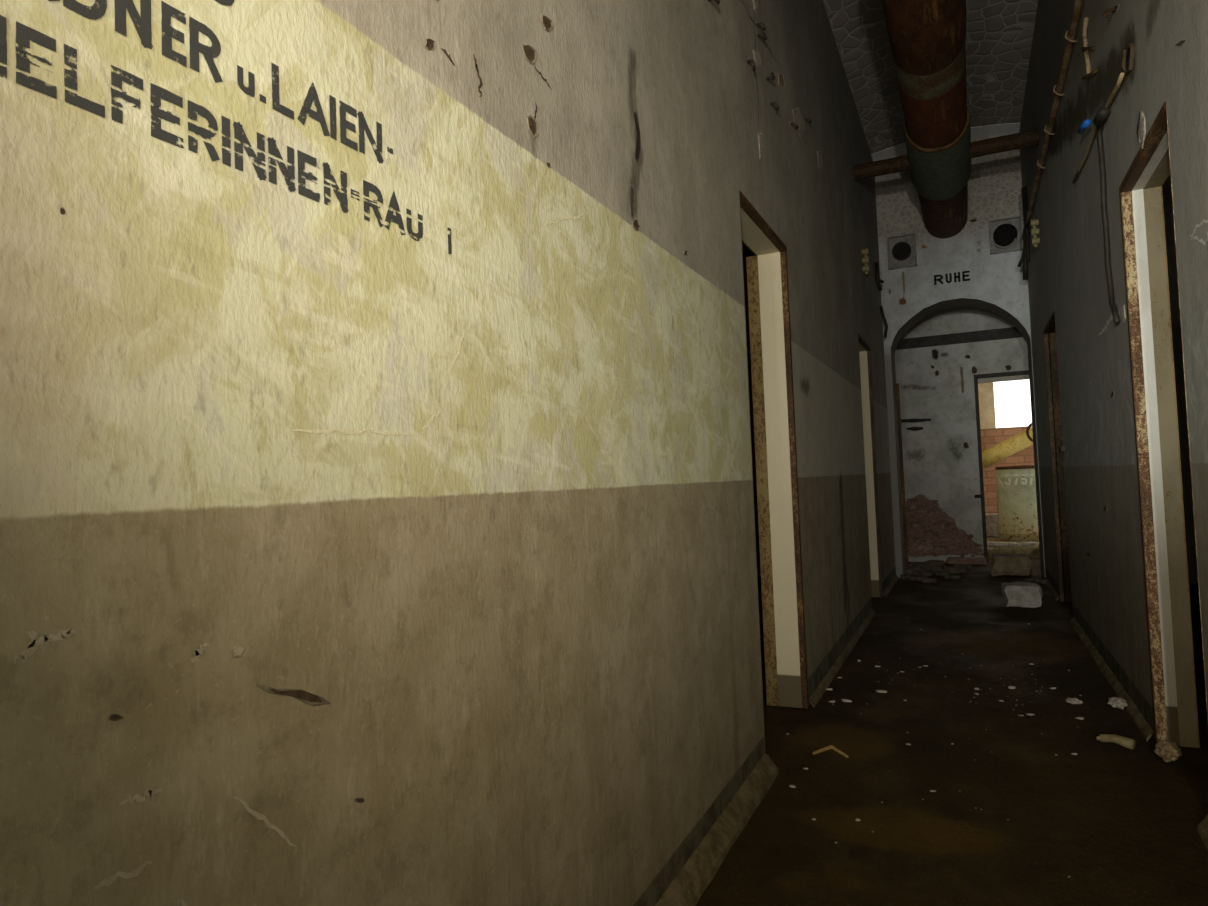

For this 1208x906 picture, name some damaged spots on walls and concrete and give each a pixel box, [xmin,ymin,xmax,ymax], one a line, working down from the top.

corrosion [882,0,967,148]